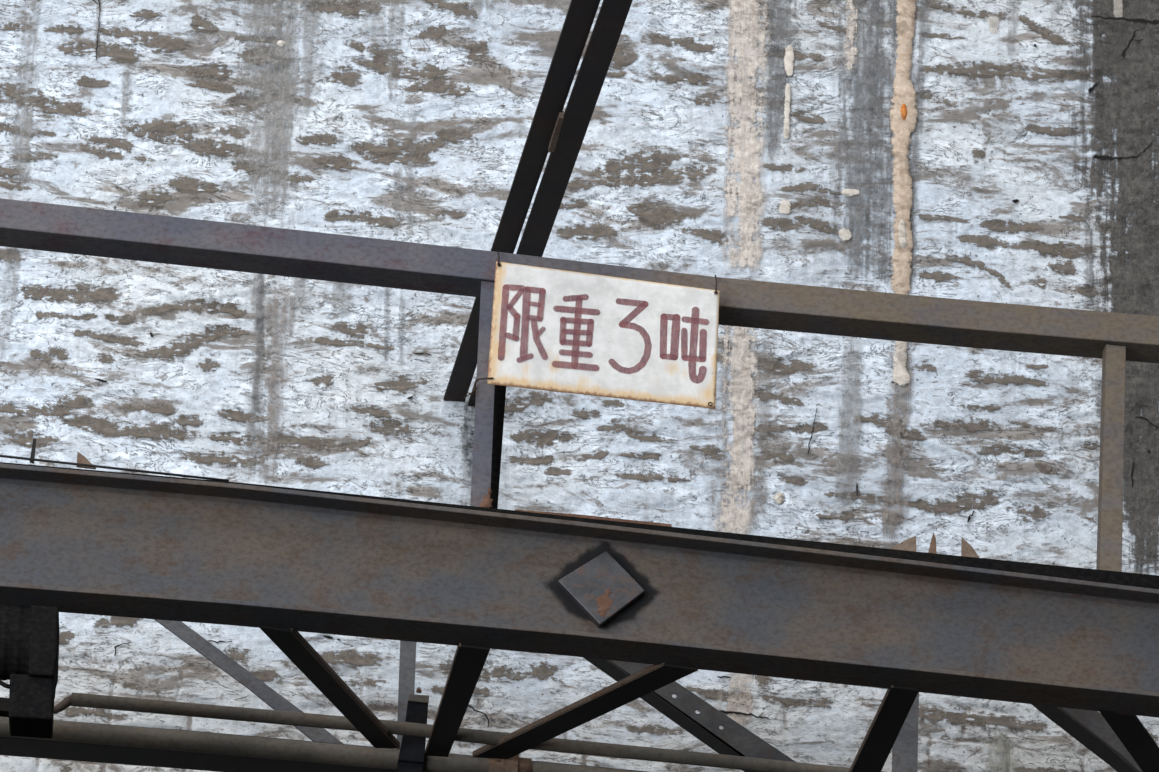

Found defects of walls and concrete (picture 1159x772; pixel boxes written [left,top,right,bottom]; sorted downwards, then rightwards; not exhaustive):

leakage [722,0,797,271]
leakage [1062,0,1159,316]
crack [1091,16,1159,57]
leakage [711,325,768,534]
leakage [1122,361,1159,571]